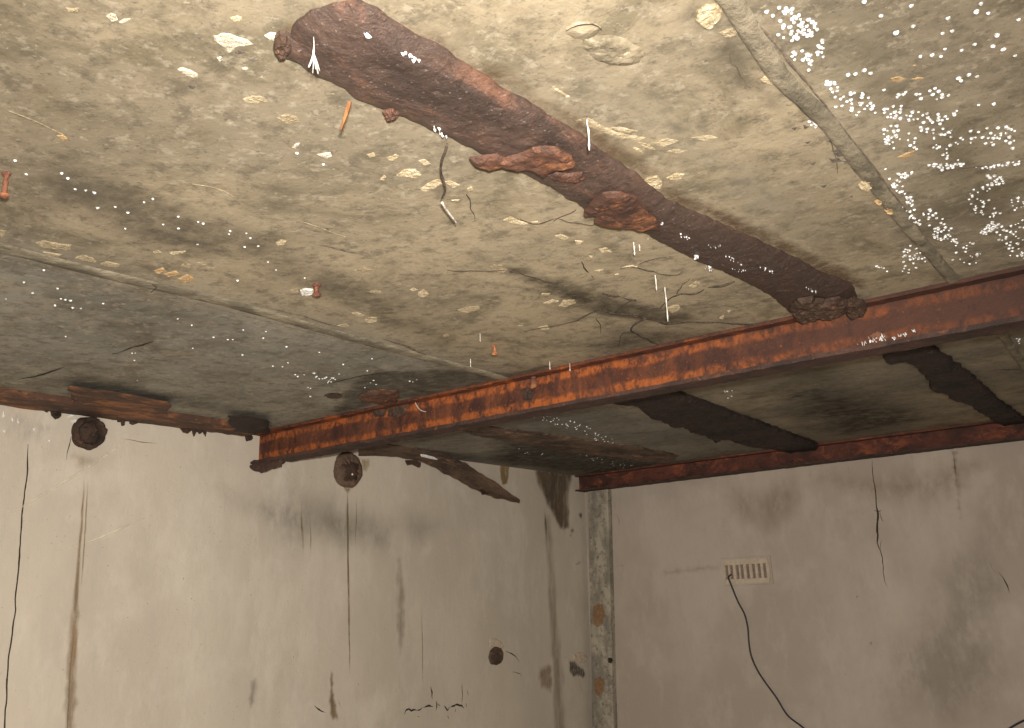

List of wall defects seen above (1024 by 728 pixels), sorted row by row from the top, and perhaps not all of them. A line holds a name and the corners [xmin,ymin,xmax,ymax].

rust [273,34,292,60]
rust [382,108,400,121]
rust [469,145,586,184]
leakage [63,180,146,216]
rust [584,191,660,232]
rust [180,428,207,436]
rust [249,459,282,473]
rust [500,466,509,484]
crack [872,467,887,586]
crack [4,449,28,728]